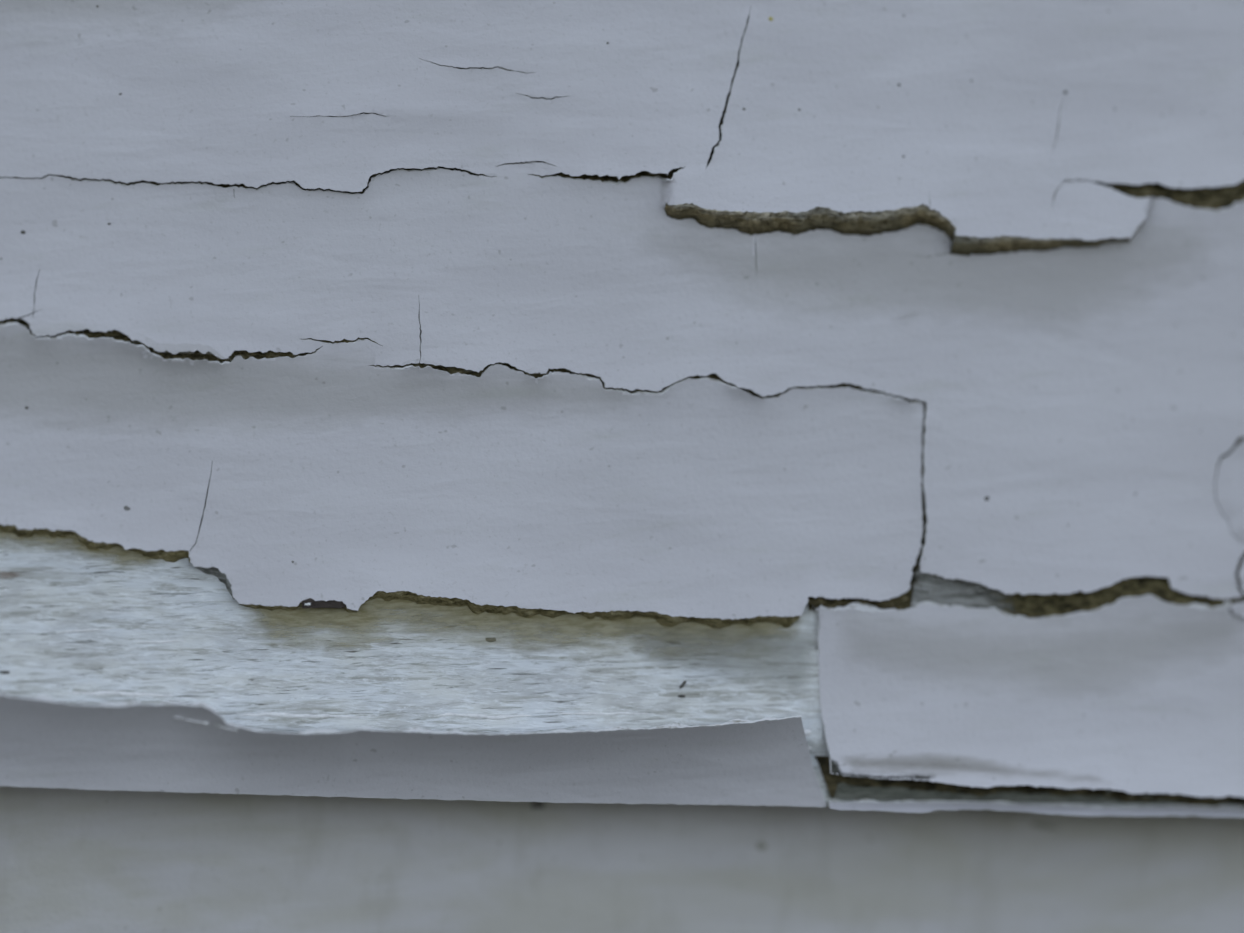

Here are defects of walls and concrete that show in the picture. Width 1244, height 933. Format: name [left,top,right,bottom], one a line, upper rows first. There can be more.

crack [0,16,749,194]
peeling [664,6,1154,256]
crack [0,270,1244,620]
peeling [0,322,1244,818]